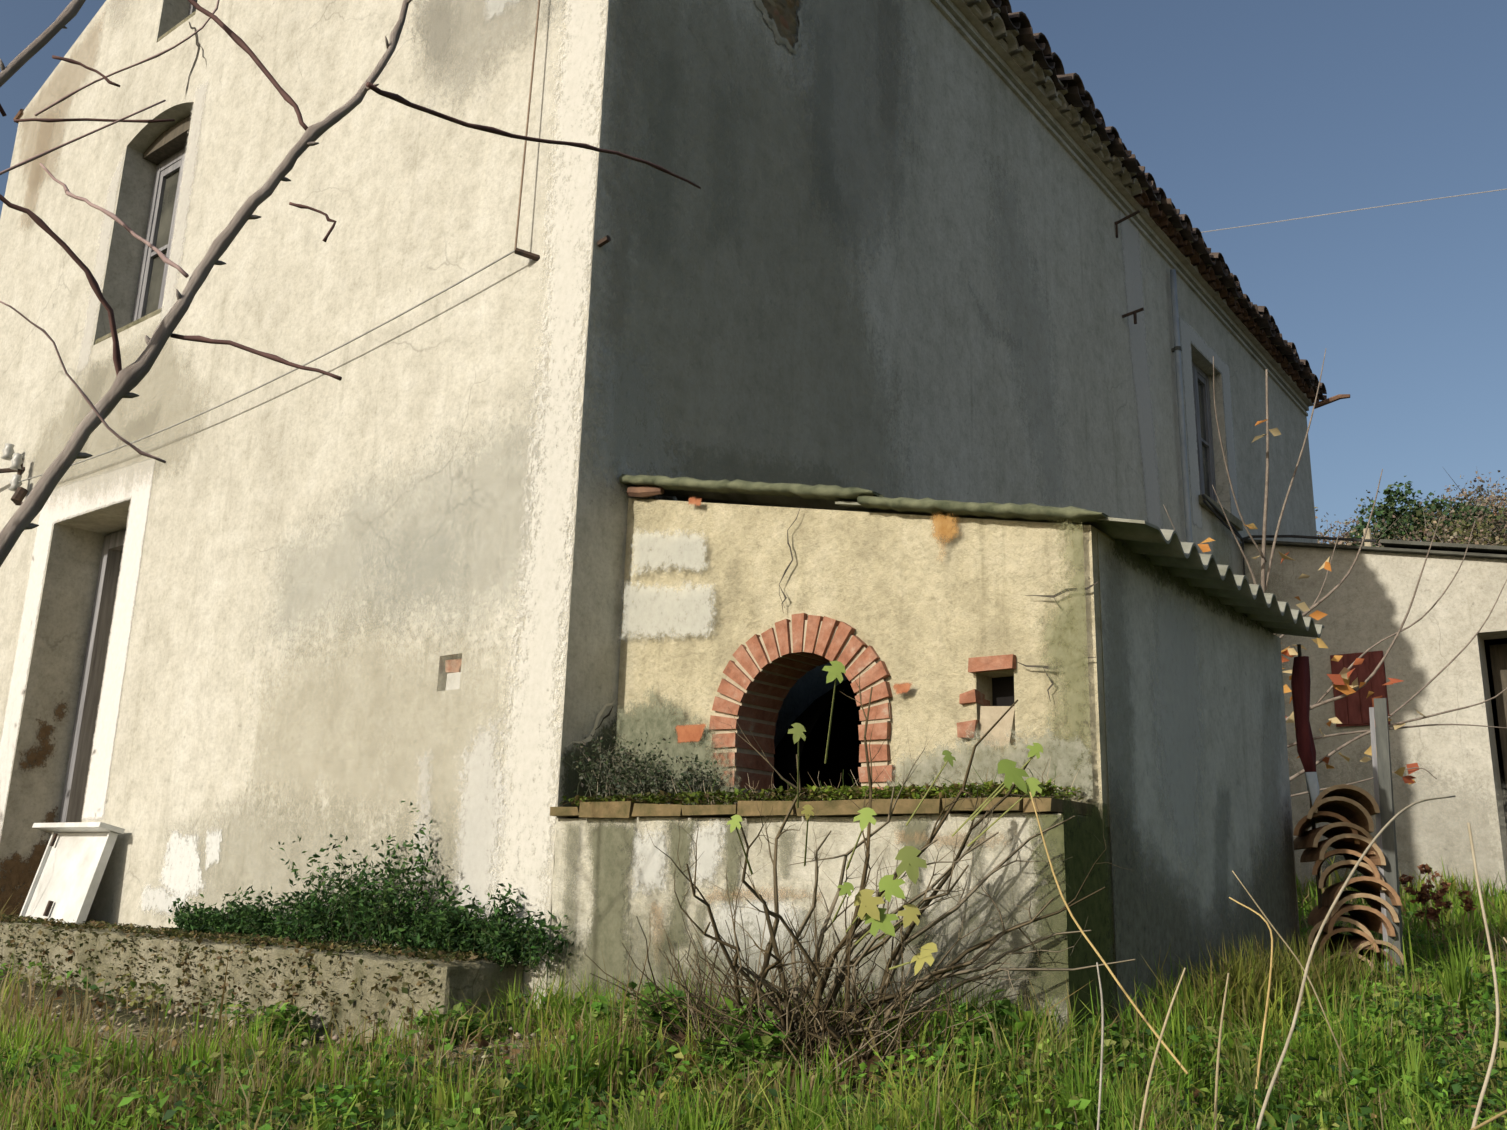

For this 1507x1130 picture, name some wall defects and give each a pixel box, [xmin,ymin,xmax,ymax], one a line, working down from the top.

crack [185,22,206,95]
spalling [754,0,804,55]
crack [779,507,801,610]
spalling [19,703,67,772]
leakage [559,820,821,989]
leakage [897,817,931,952]
leakage [1110,784,1300,1039]